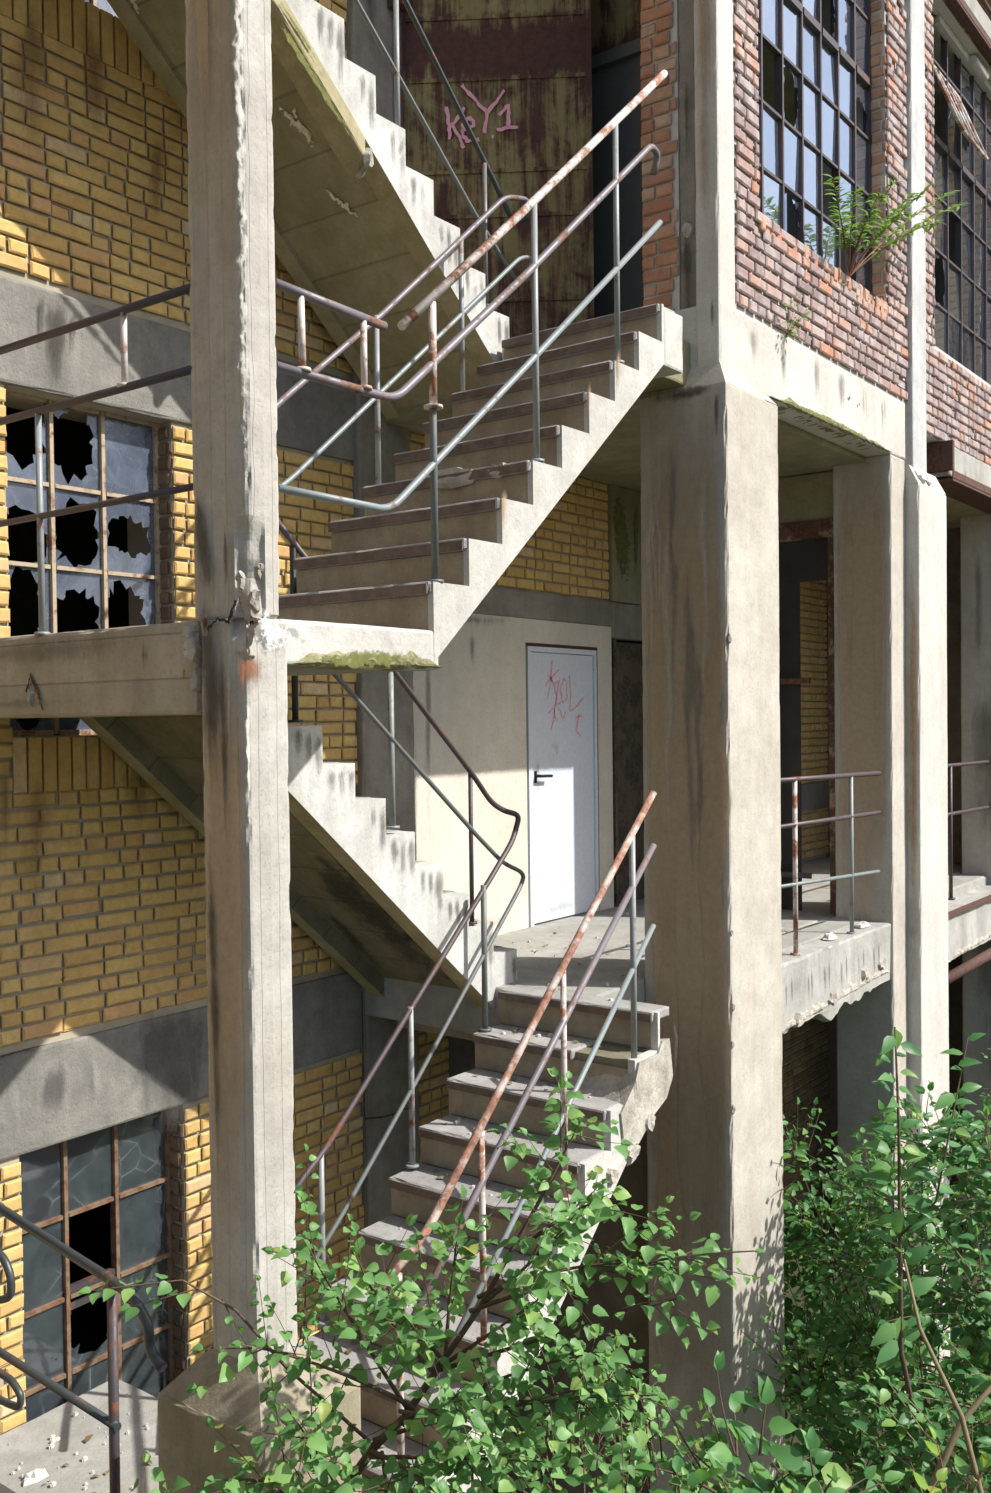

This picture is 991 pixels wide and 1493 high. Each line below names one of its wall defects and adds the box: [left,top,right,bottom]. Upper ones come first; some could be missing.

leakage [673,386,718,425]
crack [207,587,260,660]
leakage [319,845,429,968]
leakage [374,811,467,916]
leakage [634,472,731,1265]
spalling [568,1038,673,1186]